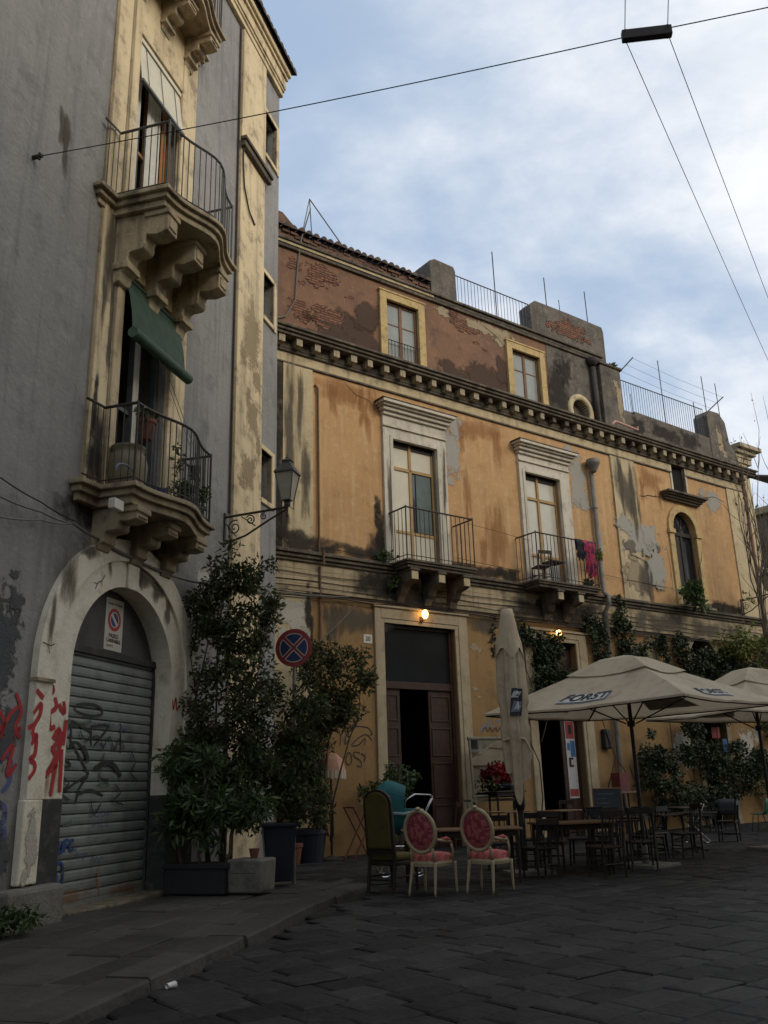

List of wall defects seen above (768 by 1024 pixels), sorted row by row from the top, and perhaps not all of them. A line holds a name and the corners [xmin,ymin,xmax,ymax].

damp [59,110,70,170]
spalling [287,296,346,332]
peeling [434,306,517,352]
spalling [545,317,591,345]
damp [547,360,571,411]
damp [276,370,310,502]
peeling [445,417,463,486]
peeling [562,444,592,511]
damp [276,470,457,612]
peeling [613,513,667,591]